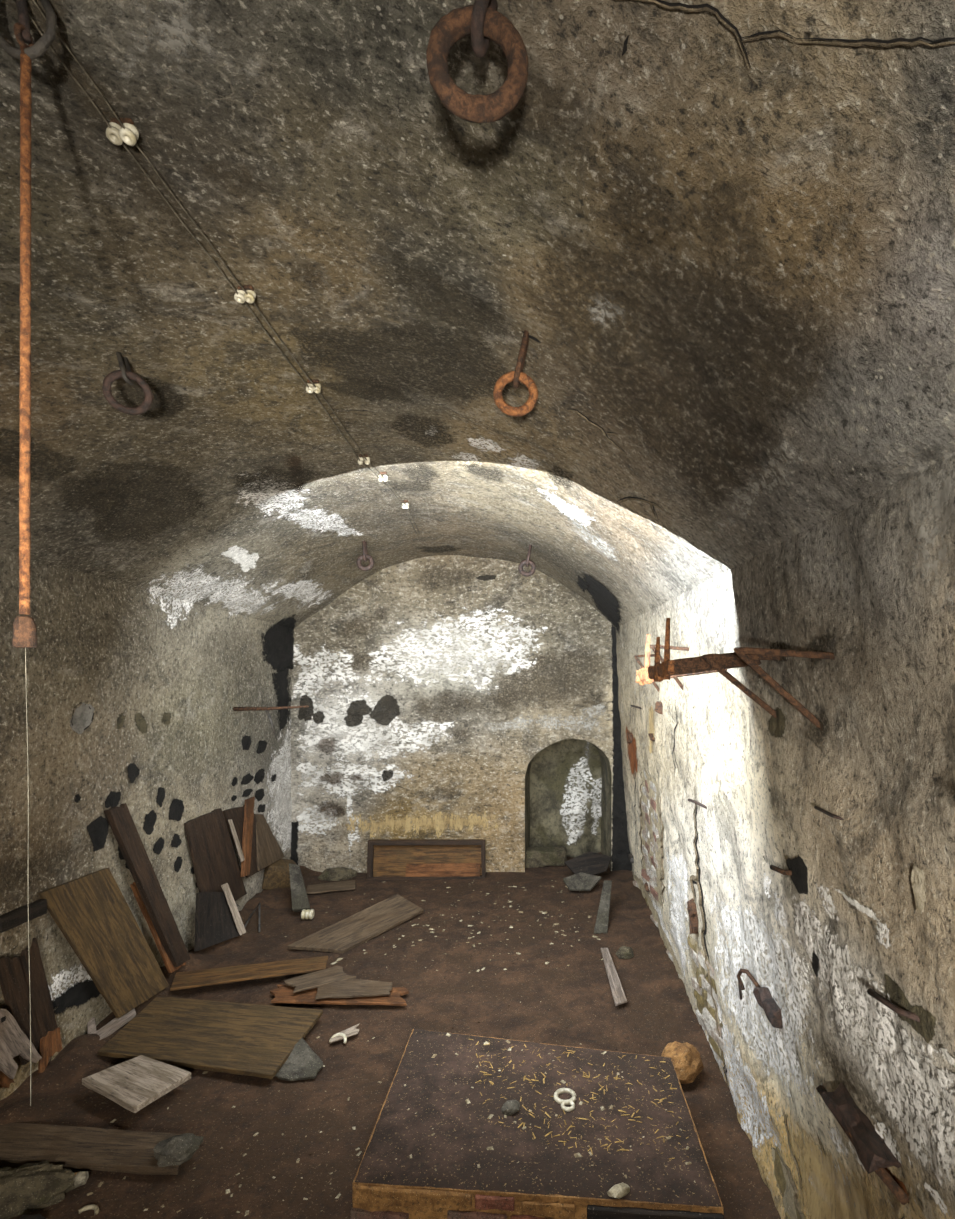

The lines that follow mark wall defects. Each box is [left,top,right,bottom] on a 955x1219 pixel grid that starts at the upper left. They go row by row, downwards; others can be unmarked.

crack [616,0,955,69]
leakage [522,72,574,128]
leakage [533,183,821,503]
leakage [289,255,617,561]
leakage [0,429,206,543]
leakage [234,456,363,536]
leakage [716,442,802,534]
leakage [145,565,333,629]
leakage [265,606,605,861]
leakage [702,873,955,1219]
flaking render [772,1145,805,1219]